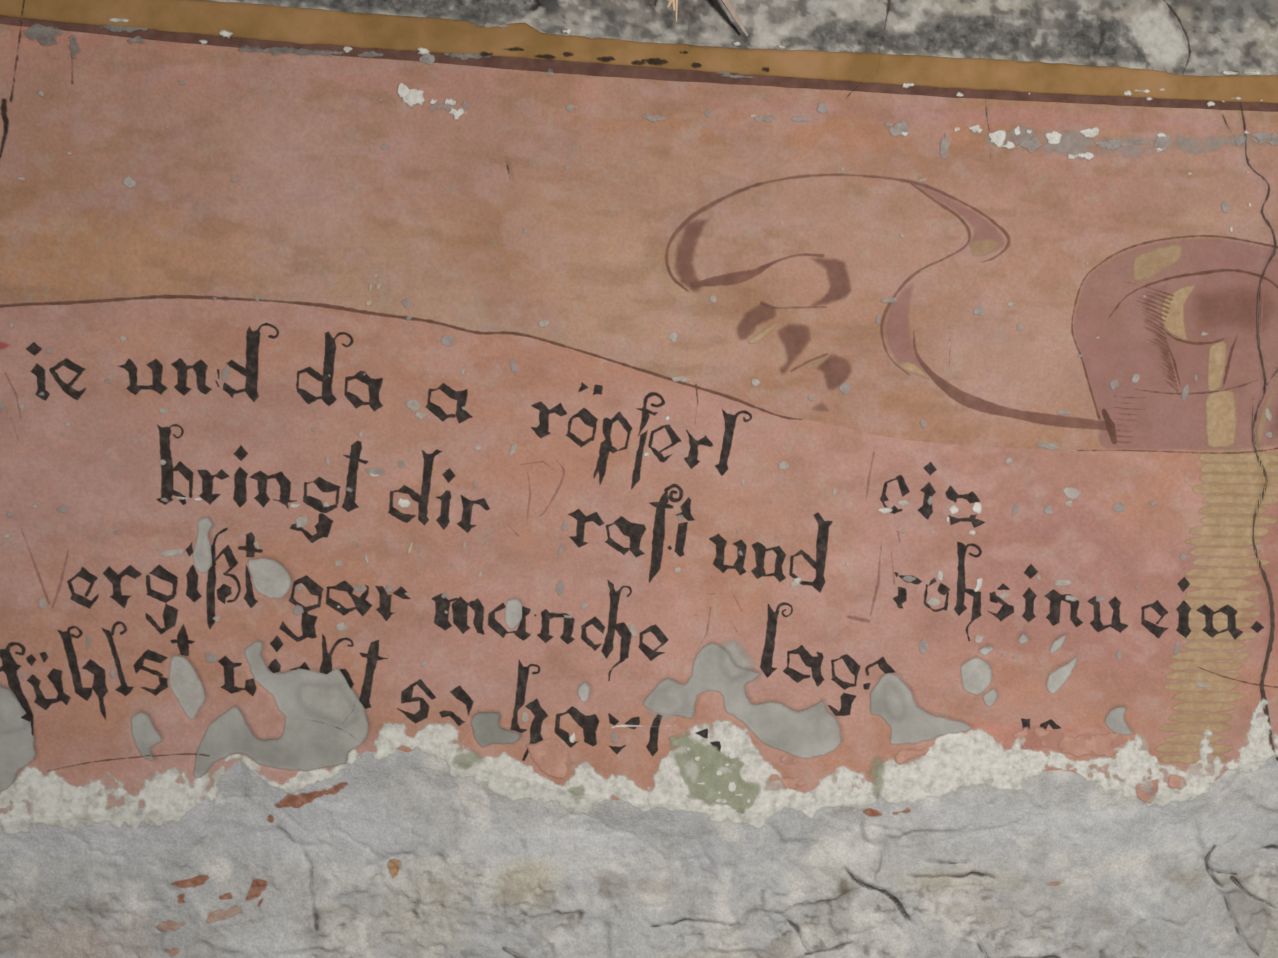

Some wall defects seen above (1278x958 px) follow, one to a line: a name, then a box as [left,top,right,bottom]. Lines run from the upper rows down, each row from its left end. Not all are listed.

peeling [24,24,80,58]
peeling [398,83,468,119]
peeling [885,122,909,136]
peeling [940,125,1278,159]
crack [1223,103,1278,761]
peeling [1055,579,1077,601]
flaking render [0,635,1278,958]
crack [950,862,985,878]
crack [849,873,907,917]
crack [1205,846,1262,955]
crack [787,920,841,955]